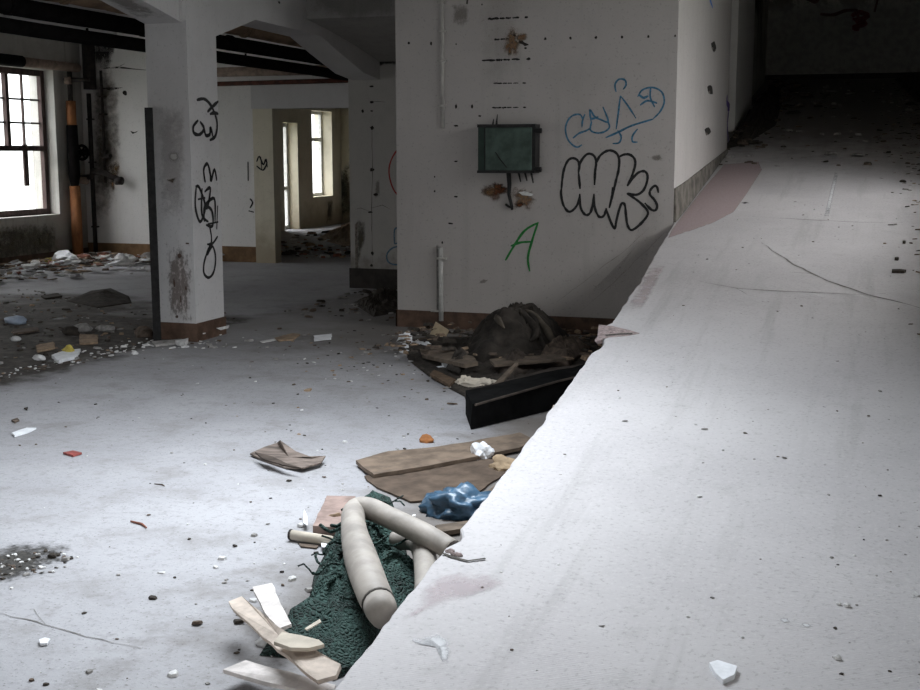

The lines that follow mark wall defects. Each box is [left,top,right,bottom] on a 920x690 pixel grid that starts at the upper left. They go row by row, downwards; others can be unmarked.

spalling [482,34,530,62]